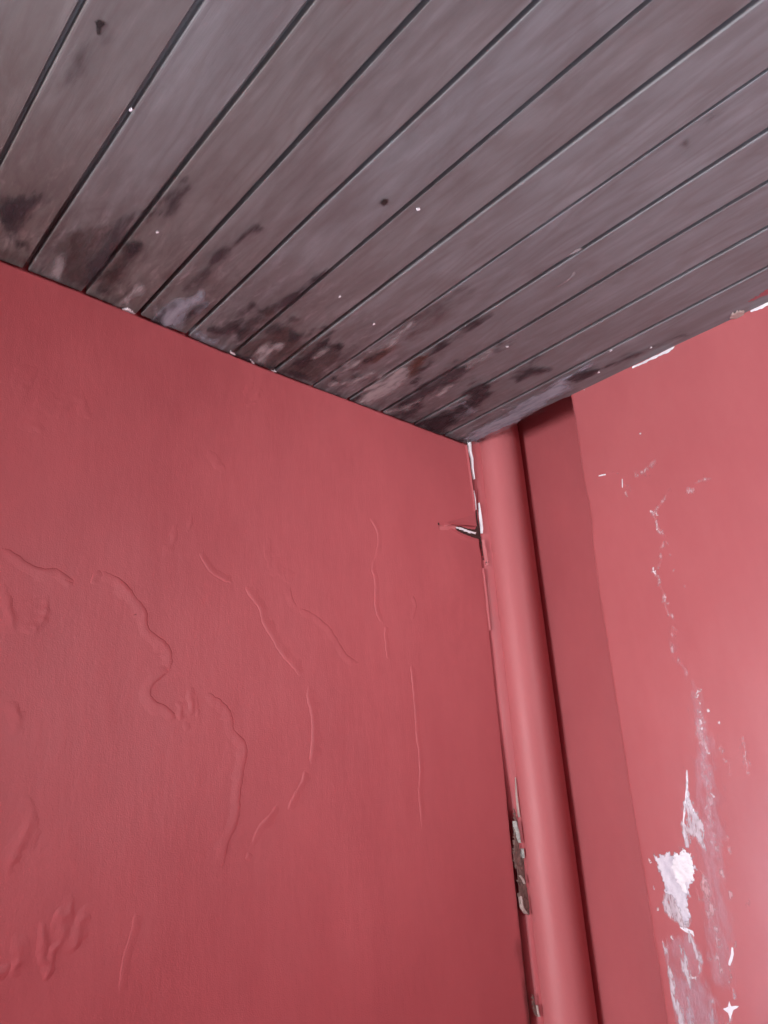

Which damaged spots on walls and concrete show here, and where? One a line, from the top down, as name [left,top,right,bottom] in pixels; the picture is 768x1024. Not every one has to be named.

leakage [52,216,142,293]
leakage [153,226,260,326]
leakage [197,271,343,381]
leakage [385,343,641,441]
crack [465,442,491,631]
spalling [512,777,530,915]
peeling [648,770,705,936]